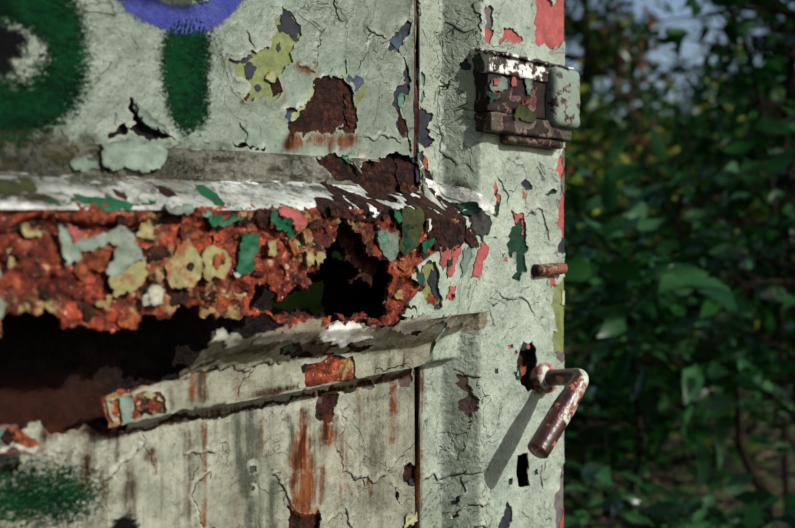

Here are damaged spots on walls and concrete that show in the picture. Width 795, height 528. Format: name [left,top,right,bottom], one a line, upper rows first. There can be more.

peeling [228,9,301,102]
crack [444,0,485,45]
peeling [534,0,564,49]
corrosion [285,63,467,288]
crack [437,122,473,170]
spalling [0,65,500,435]
peeling [501,210,527,281]
corrosion [288,306,392,327]
corrosion [190,357,239,417]
crack [100,354,415,486]
corrosion [227,339,411,515]
crack [421,367,490,528]